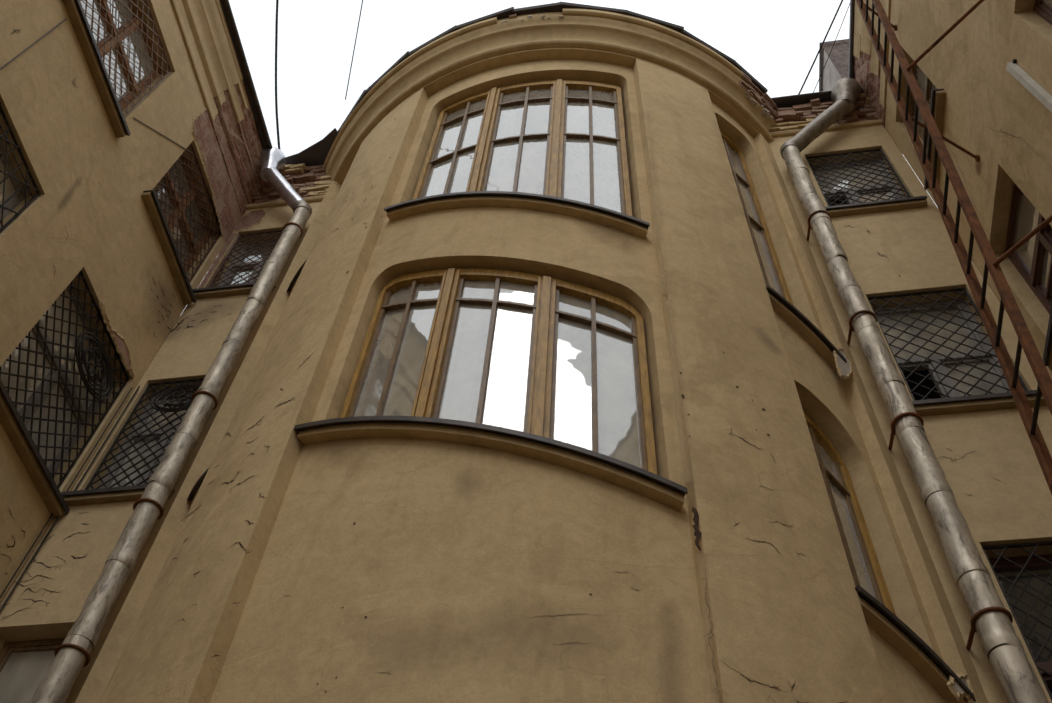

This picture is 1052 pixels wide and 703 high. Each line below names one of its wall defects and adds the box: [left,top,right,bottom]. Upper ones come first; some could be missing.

flaking render [192,108,268,288]
crack [0,510,88,620]
crack [172,388,294,576]
crack [701,571,808,703]